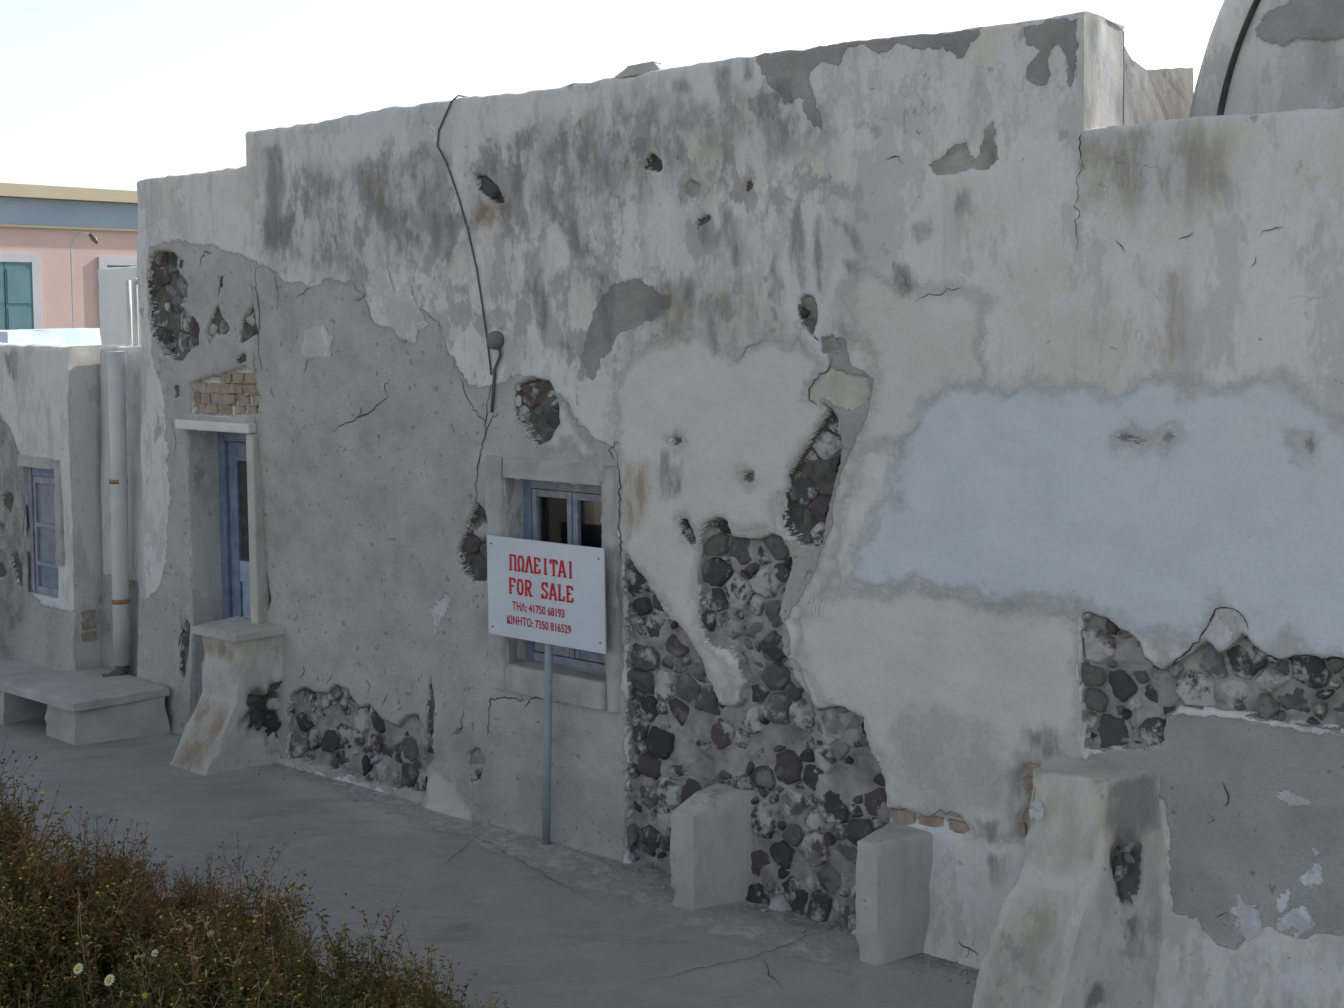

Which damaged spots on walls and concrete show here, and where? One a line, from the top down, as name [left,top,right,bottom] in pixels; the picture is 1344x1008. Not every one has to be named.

flaking render [755,27,981,127]
flaking render [1024,18,1079,86]
crack [459,376,497,499]
flaking render [0,239,988,932]
flaking render [1078,612,1344,950]